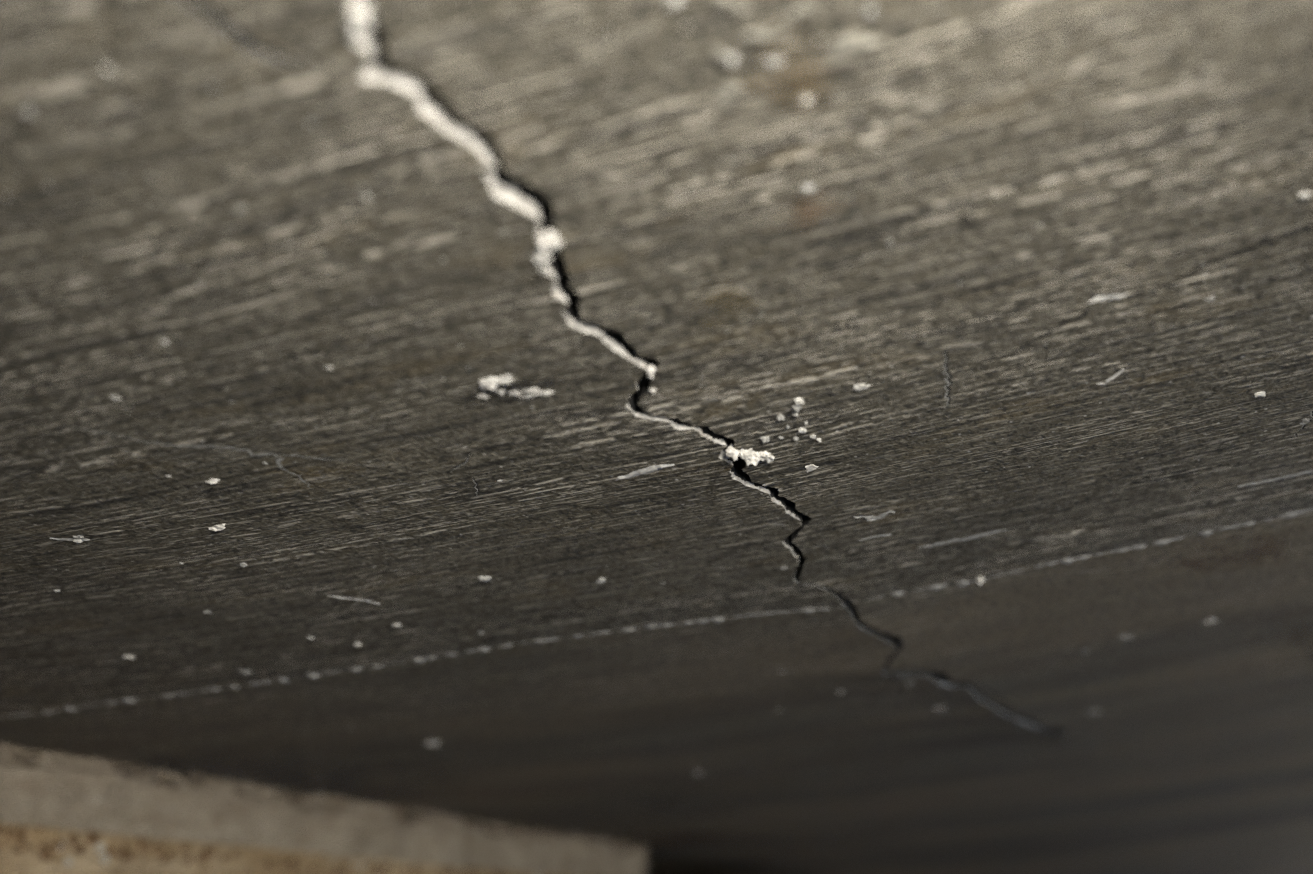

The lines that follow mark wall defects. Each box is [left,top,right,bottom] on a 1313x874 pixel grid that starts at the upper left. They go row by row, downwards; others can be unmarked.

crack [1151,224,1313,293]
crack [1017,303,1092,349]
crack [347,0,1044,731]